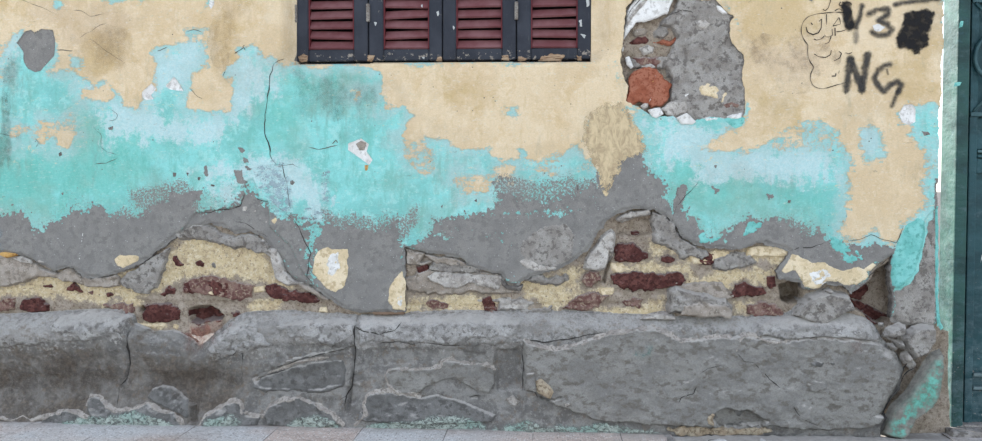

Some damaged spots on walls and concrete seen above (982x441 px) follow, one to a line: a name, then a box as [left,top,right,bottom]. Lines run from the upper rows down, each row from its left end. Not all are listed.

flaking render [17,29,55,72]
flaking render [622,0,745,128]
crack [204,59,338,283]
flaking render [0,147,940,355]
crack [117,332,131,404]
crack [233,320,460,404]
crack [522,332,603,397]